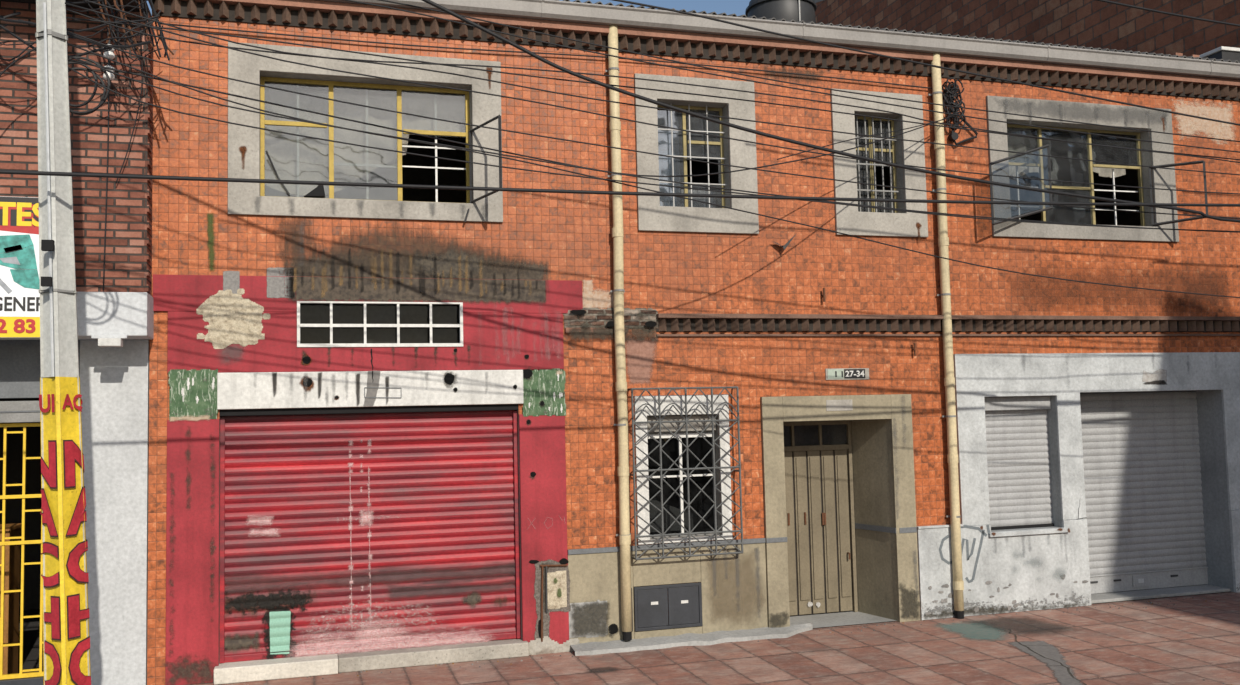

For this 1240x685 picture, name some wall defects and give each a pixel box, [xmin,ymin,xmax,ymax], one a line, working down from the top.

damp [322,250,363,297]
damp [419,256,520,297]
spalling [196,289,270,349]
peeling [168,369,218,421]
peeling [294,440,489,657]
crack [1007,630,1087,685]